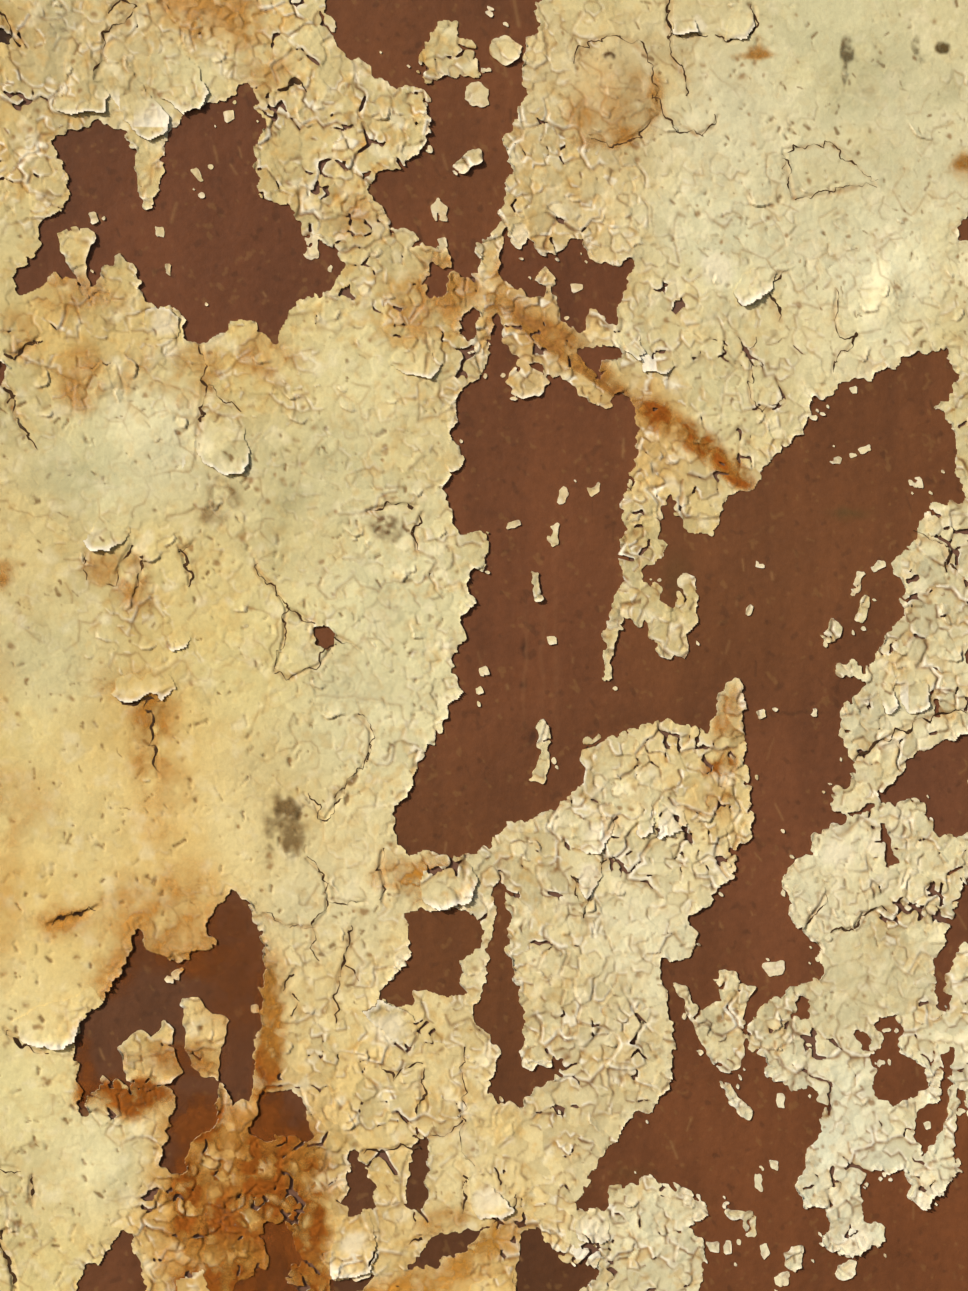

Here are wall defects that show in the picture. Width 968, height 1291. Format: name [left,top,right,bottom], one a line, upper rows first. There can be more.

crack [573,0,759,148]
peeling [9,44,349,352]
corrosion [409,266,754,491]
crack [254,563,361,680]
peeling [316,0,968,1291]
corrosion [76,1059,175,1119]
corrosion [97,903,208,996]
peeling [11,880,319,1175]
corrosion [166,974,332,1291]
crack [364,1047,475,1211]
crack [804,891,897,933]
peeling [69,1225,151,1291]